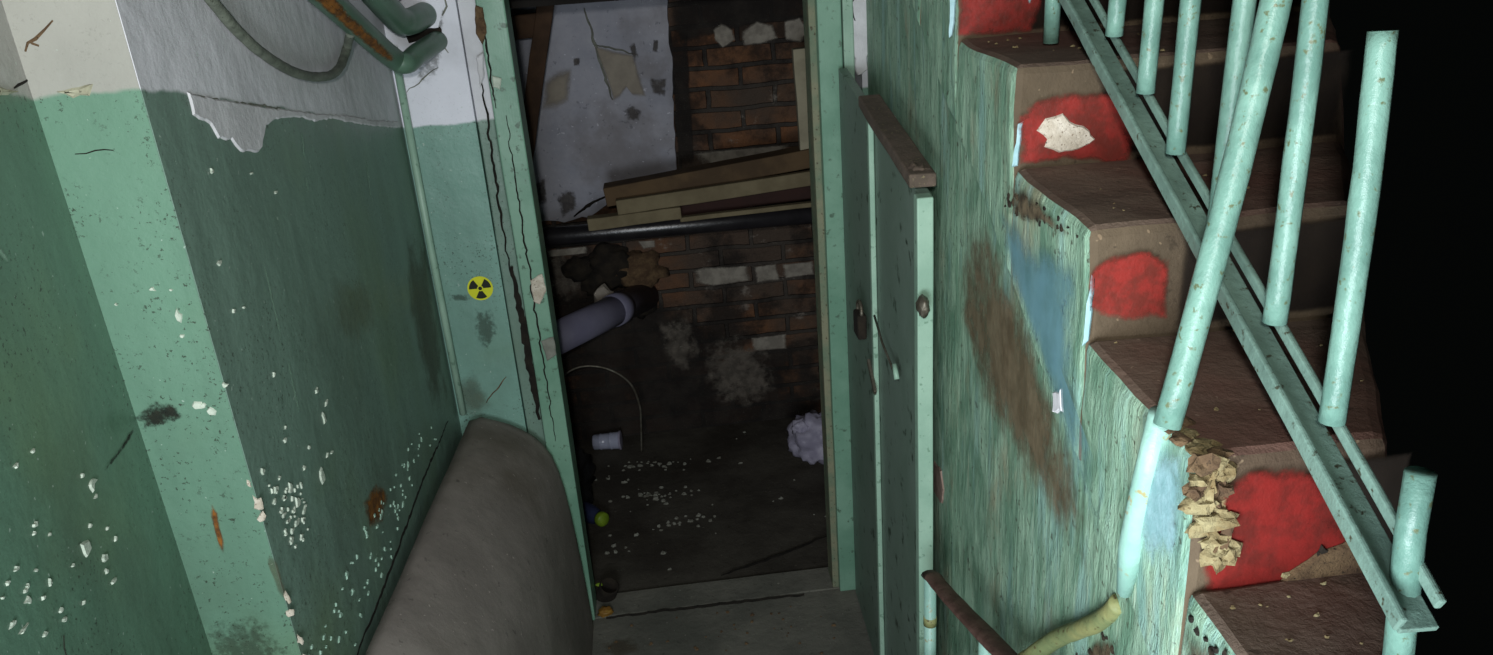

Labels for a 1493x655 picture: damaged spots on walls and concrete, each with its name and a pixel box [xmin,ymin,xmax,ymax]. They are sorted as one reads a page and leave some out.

peeling [187,92,399,153]
peeling [80,473,98,499]
peeling [247,446,334,548]
rust [366,490,386,524]
spalling [1143,416,1243,575]
peeling [71,524,118,585]
peeling [297,426,437,655]
peeling [1,566,67,637]
flaking render [283,591,294,617]